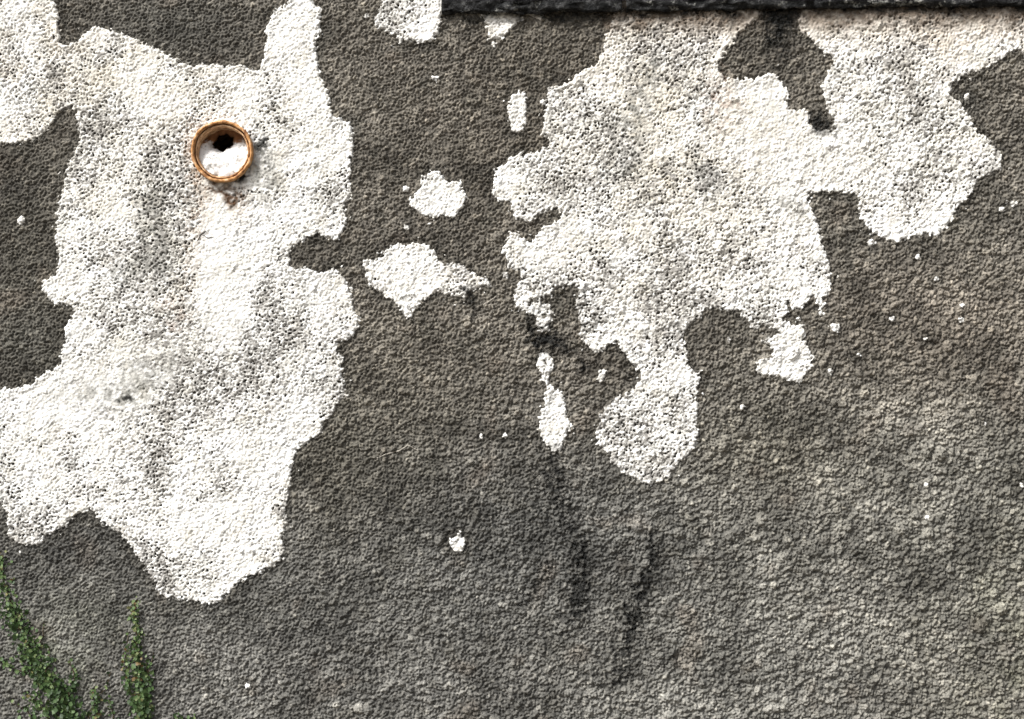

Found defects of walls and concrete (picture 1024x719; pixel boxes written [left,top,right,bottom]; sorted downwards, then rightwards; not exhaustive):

peeling [364,0,442,47]
peeling [481,13,542,48]
peeling [403,167,468,224]
peeling [0,0,361,605]
peeling [362,225,492,319]
peeling [492,6,1024,486]